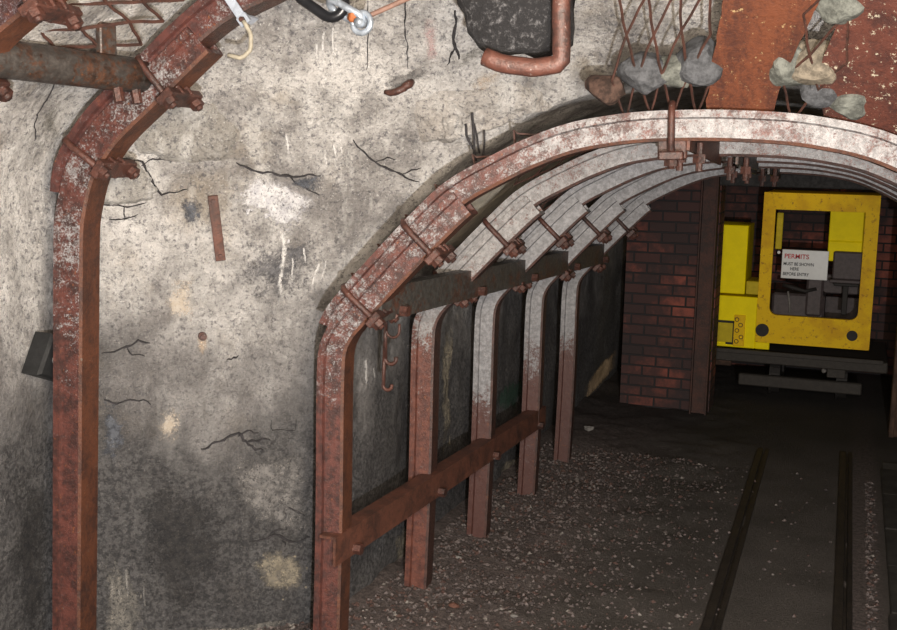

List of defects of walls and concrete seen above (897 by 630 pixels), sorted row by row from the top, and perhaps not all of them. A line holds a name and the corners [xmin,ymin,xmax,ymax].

crack [353,140,420,182]
crack [104,158,187,221]
crack [236,162,321,195]
crack [101,339,150,356]
crack [104,398,151,406]
crack [201,420,296,451]
crack [238,476,310,547]